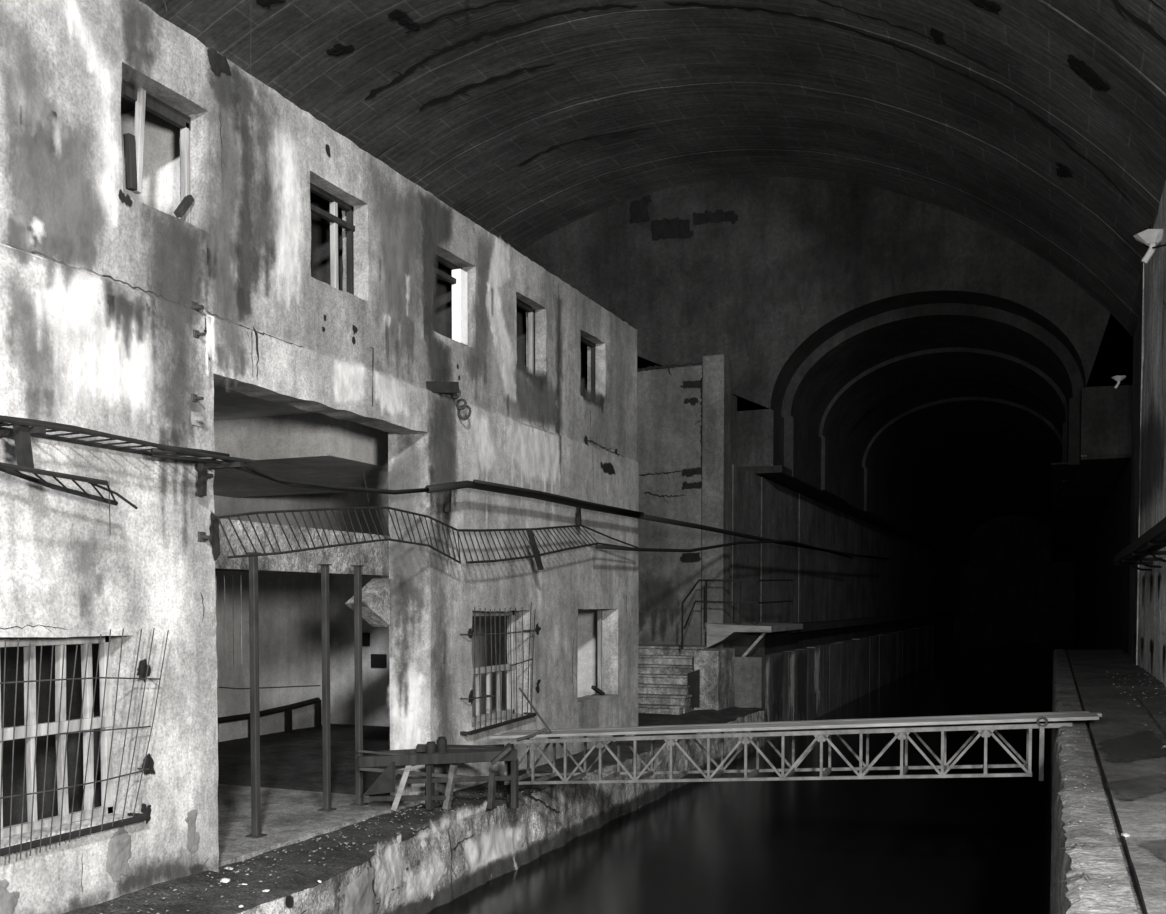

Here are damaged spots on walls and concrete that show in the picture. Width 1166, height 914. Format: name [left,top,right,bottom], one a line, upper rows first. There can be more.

crack [365,0,1132,203]
crack [7,244,157,313]
water stain [0,0,303,503]
crack [205,311,305,377]
crack [1,625,68,634]
peeling [0,880,20,914]